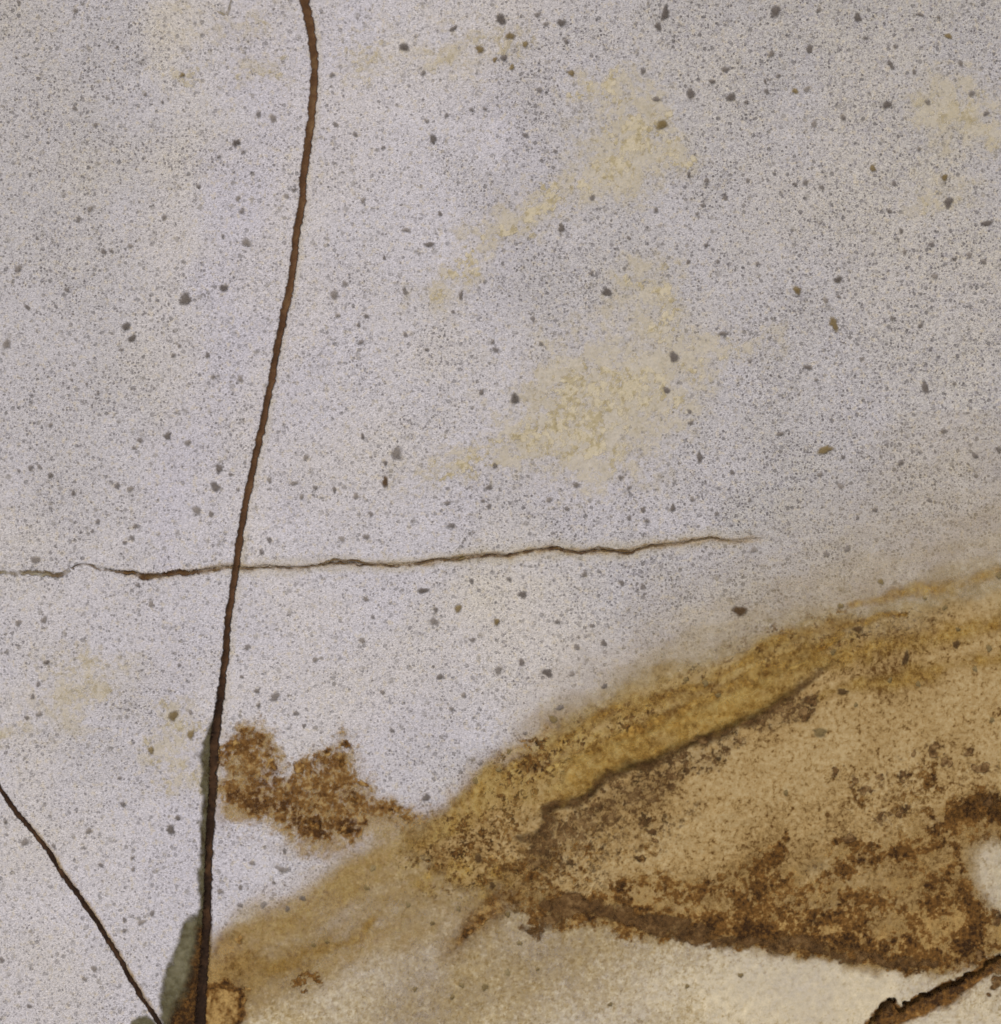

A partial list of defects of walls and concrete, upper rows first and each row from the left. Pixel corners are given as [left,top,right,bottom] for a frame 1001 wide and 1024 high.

crack [0,0,729,1024]
leakage [131,573,1001,1024]
crack [864,950,1001,1024]